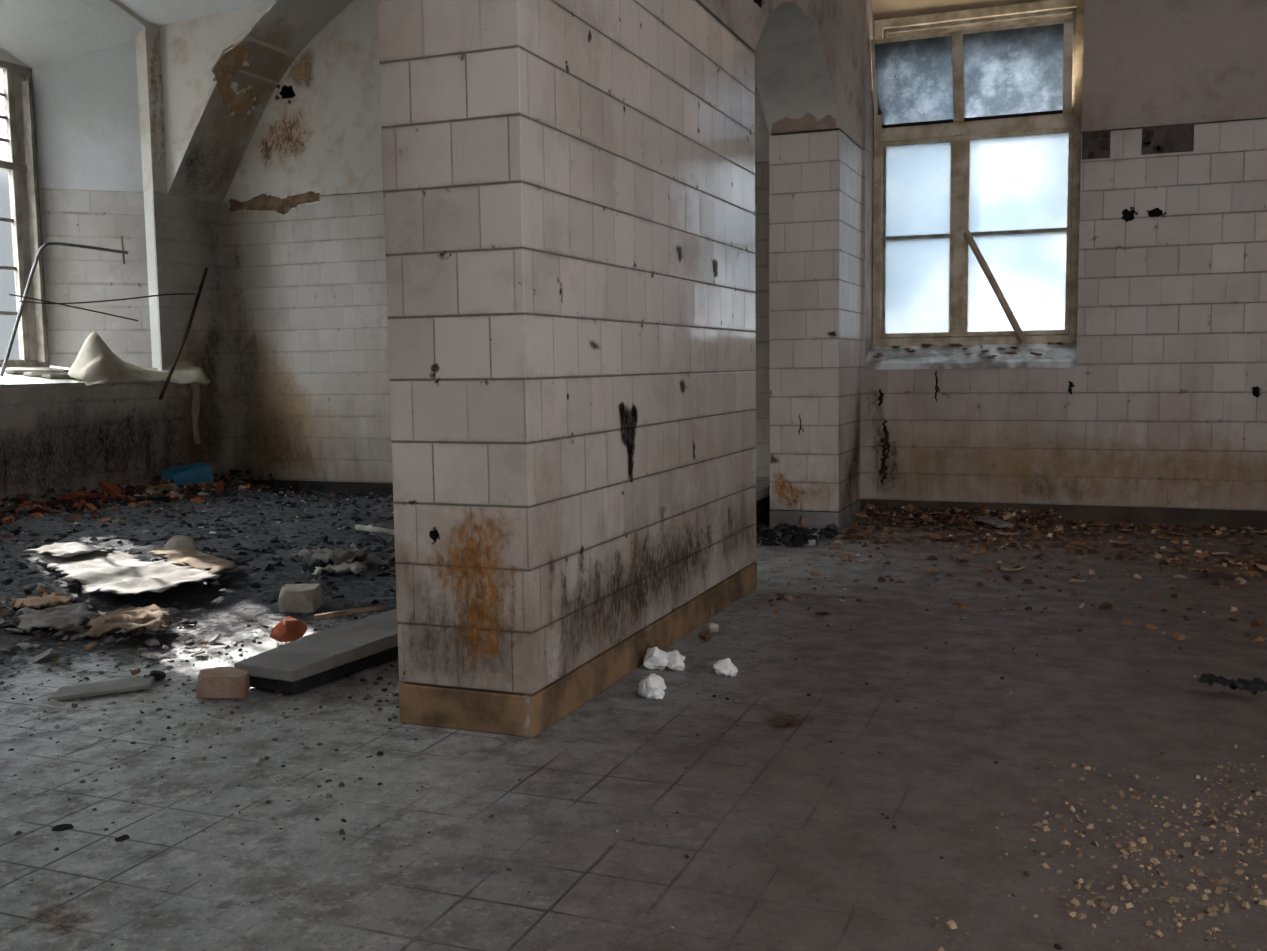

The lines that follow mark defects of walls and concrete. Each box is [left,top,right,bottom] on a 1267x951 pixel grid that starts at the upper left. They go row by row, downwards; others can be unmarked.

flaking render [211,42,256,118]
leakage [262,112,306,160]
flaking render [275,84,296,104]
flaking render [771,113,837,133]
flaking render [227,191,321,215]
leakage [619,401,638,482]
rust [437,515,515,657]
leakage [563,531,711,674]